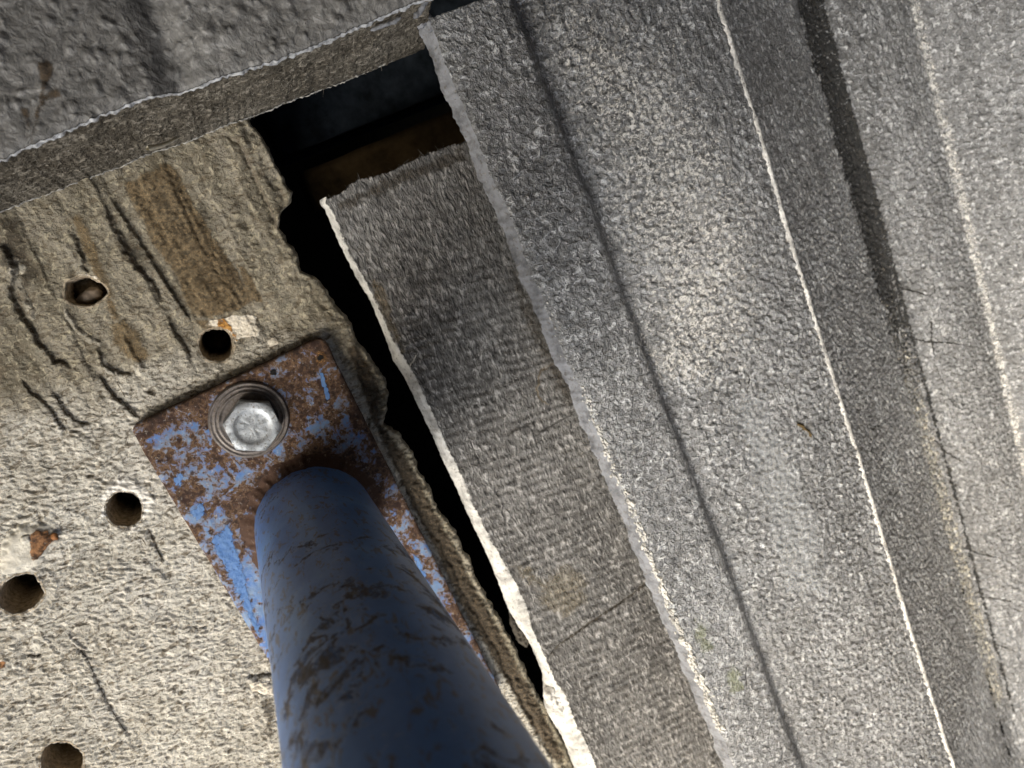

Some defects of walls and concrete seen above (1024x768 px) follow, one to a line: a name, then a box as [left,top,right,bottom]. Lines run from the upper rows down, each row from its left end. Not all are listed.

crack [2,244,72,373]
crack [20,378,89,431]
crack [98,342,141,417]
crack [105,198,192,357]
damp [125,165,262,329]
spalling [208,315,278,347]
crack [931,437,964,463]
crack [68,641,130,760]